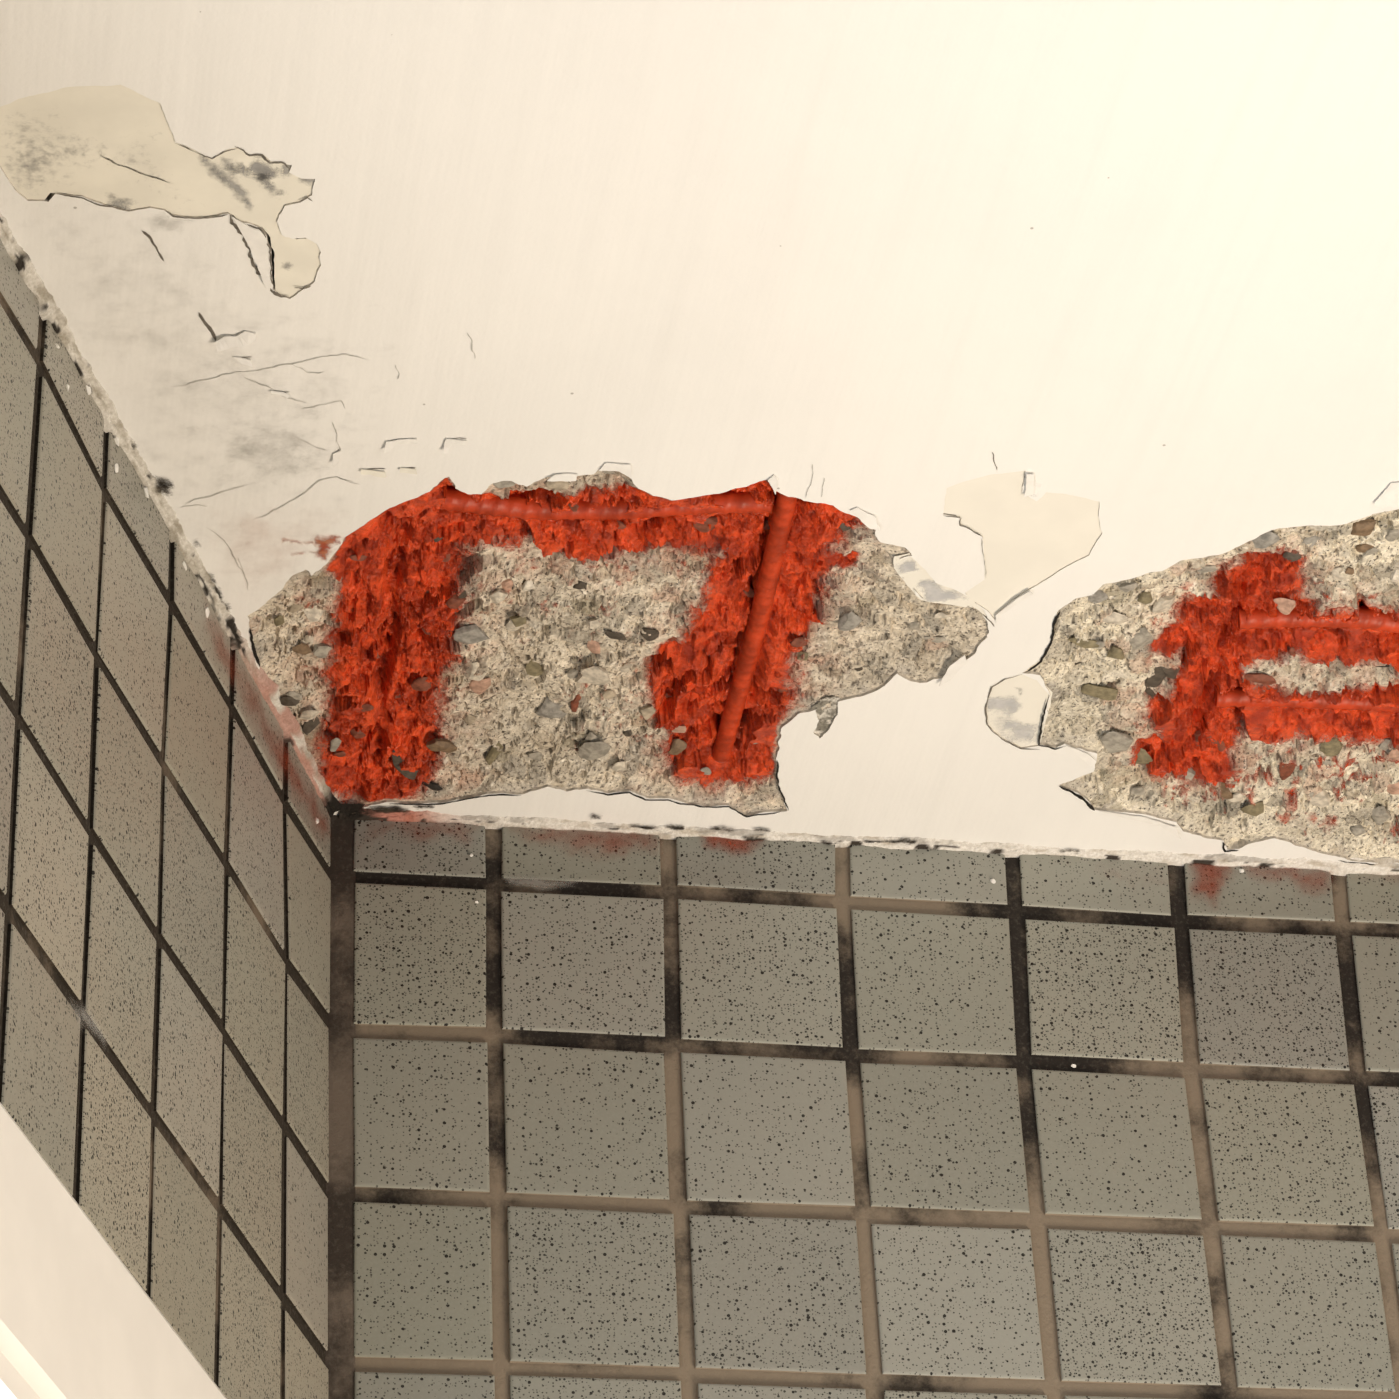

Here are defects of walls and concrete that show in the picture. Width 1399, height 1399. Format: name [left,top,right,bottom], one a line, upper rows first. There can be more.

peeling [0,85,321,298]
leakage [157,479,173,494]
crack [183,484,248,589]
crack [173,354,399,519]
peeling [361,438,418,478]
spalling [249,463,1102,817]
spalling [985,482,1399,865]